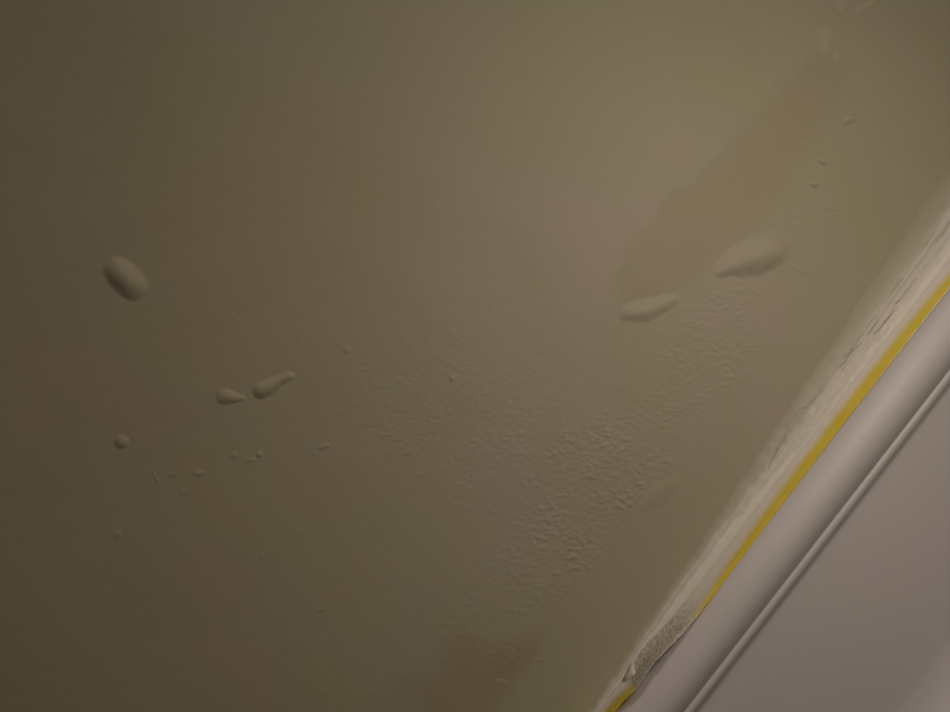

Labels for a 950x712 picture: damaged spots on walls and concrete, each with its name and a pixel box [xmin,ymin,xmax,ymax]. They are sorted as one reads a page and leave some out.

crack [841,278,917,366]